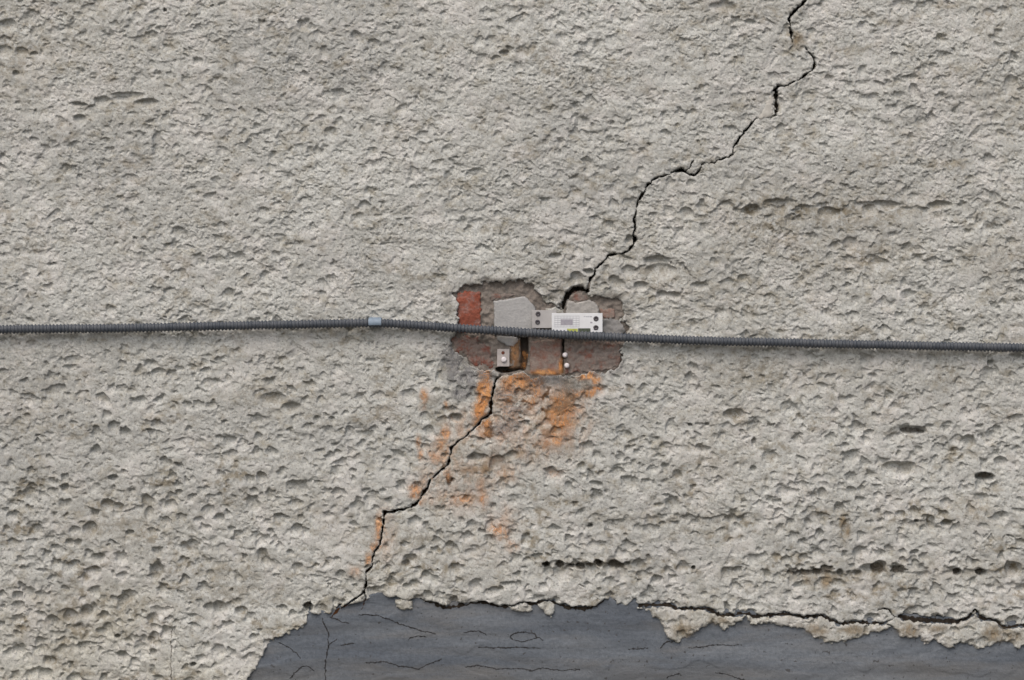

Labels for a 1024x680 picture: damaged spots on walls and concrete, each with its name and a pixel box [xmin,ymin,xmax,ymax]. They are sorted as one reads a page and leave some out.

crack [562,0,817,308]
spalling [451,279,629,379]
rust [475,371,492,436]
rust [503,351,562,412]
rust [550,371,601,444]
crack [279,370,510,680]
peeling [508,601,555,618]
peeling [637,606,1024,649]
crack [638,603,1024,629]